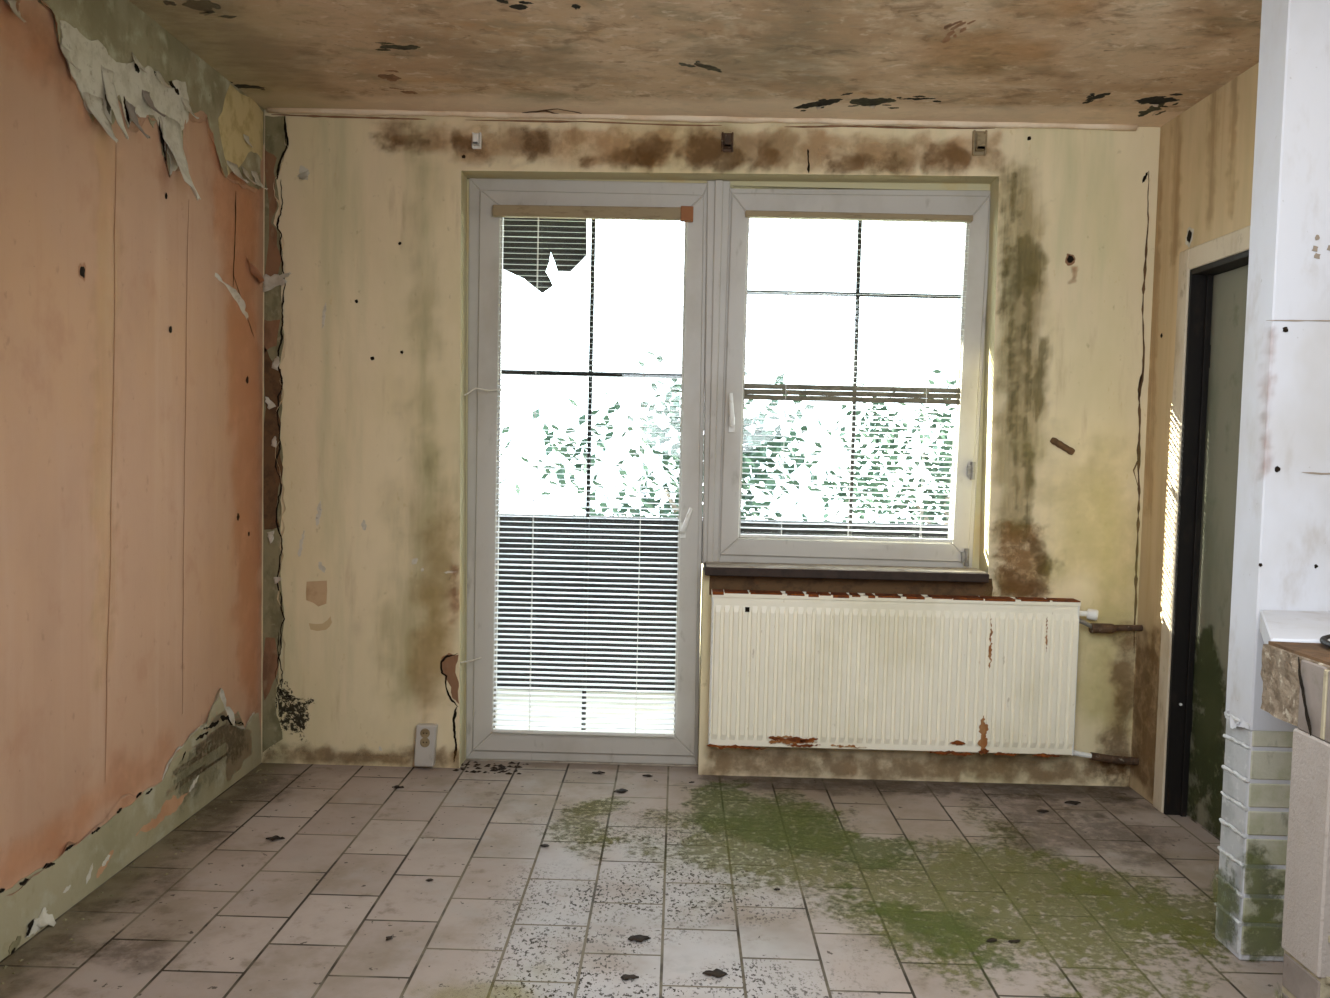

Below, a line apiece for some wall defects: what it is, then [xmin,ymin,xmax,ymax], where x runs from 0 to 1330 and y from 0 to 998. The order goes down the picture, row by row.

peeling [496,0,534,10]
peeling [794,93,941,111]
peeling [1082,93,1111,104]
peeling [1135,93,1183,117]
leakage [832,156,865,171]
leakage [929,146,970,167]
crack [233,114,426,703]
leakage [995,175,1052,597]
crack [1133,171,1149,645]
peeling [0,0,291,961]
spalling [440,653,459,707]
leakage [710,637,1159,795]